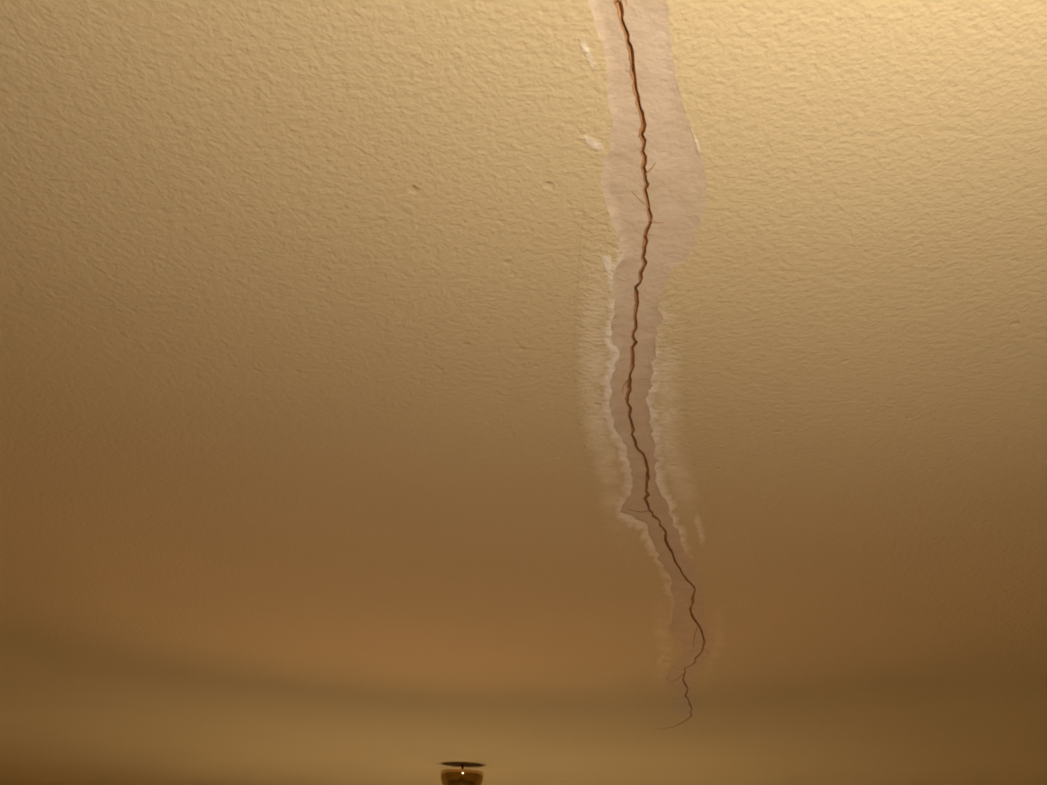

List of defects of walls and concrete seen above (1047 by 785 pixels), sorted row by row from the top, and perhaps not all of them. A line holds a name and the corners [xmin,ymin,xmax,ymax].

peeling [573,0,728,718]
crack [613,0,709,729]